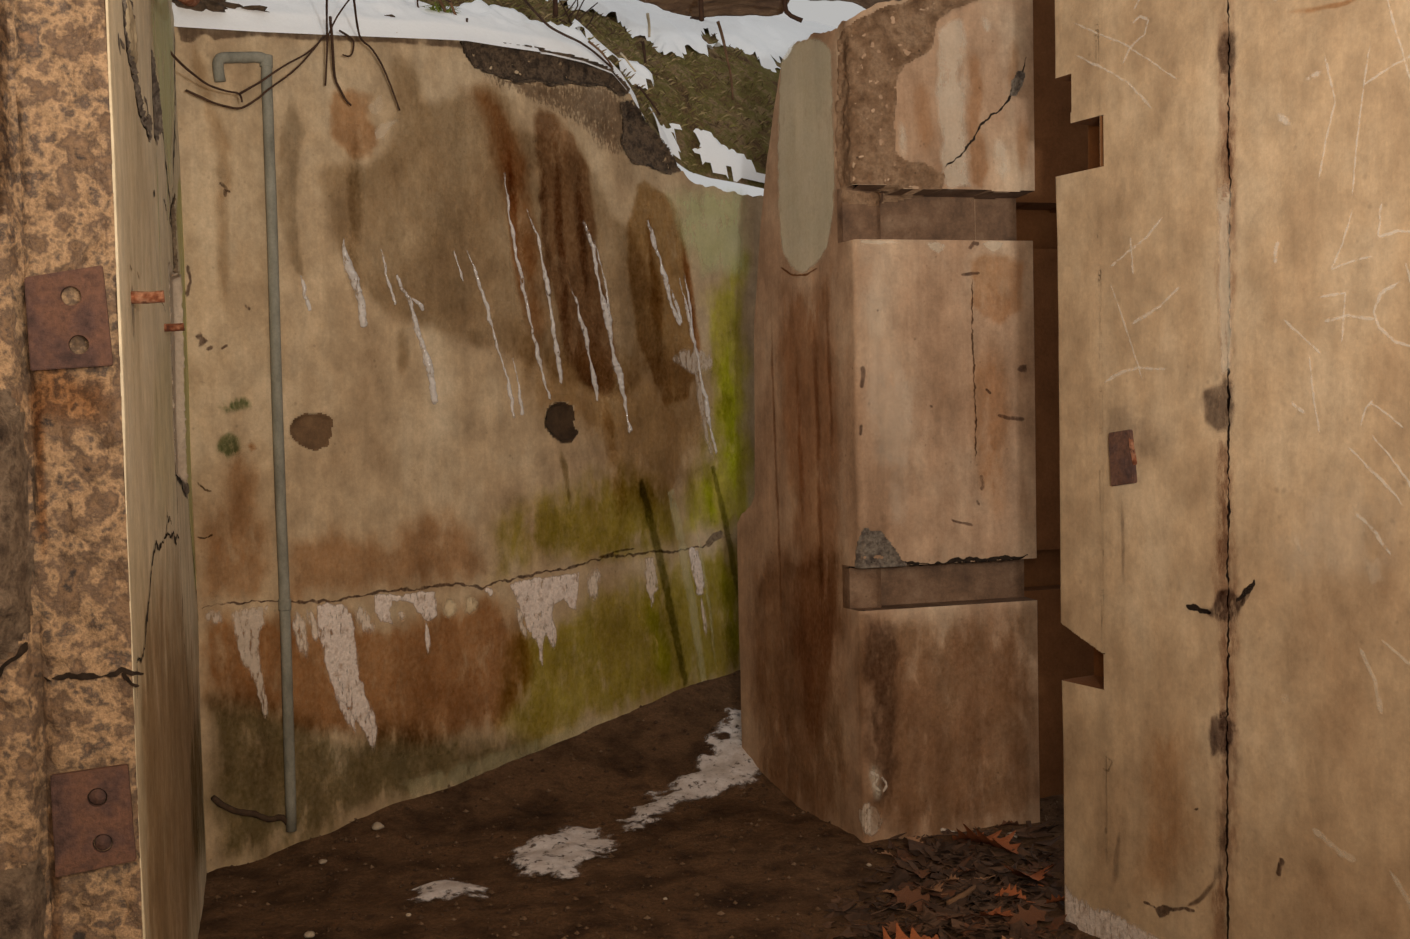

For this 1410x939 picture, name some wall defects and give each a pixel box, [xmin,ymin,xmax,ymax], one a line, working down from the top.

crack [945,58,1026,167]
leakage [454,251,524,416]
leakage [505,179,563,399]
leakage [572,292,598,401]
leakage [585,226,633,433]
leakage [648,221,717,454]
crack [0,473,723,725]
leakage [645,543,664,605]
efflorescence [689,547,707,631]
spalling [855,528,907,568]
crack [1186,0,1255,939]